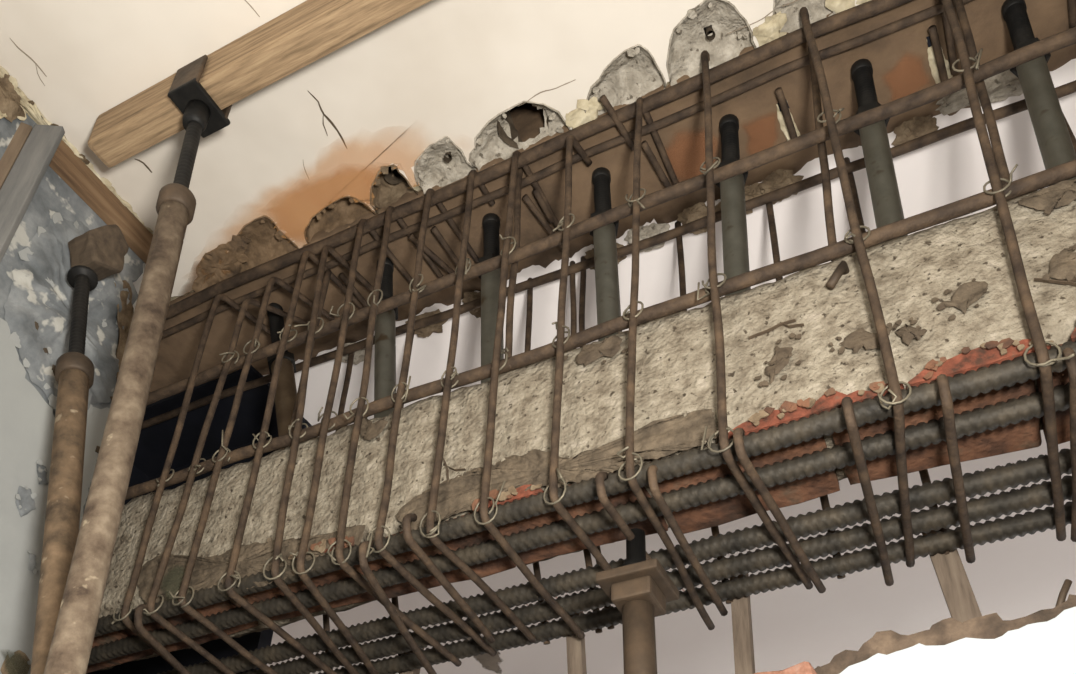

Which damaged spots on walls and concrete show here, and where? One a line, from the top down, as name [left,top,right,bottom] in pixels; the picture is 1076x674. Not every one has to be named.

crack [10,38,47,86]
peeling [0,66,153,235]
crack [308,91,347,149]
peeling [4,212,89,413]
peeling [85,273,134,414]
spalling [125,0,1076,500]
spalling [88,327,1076,674]